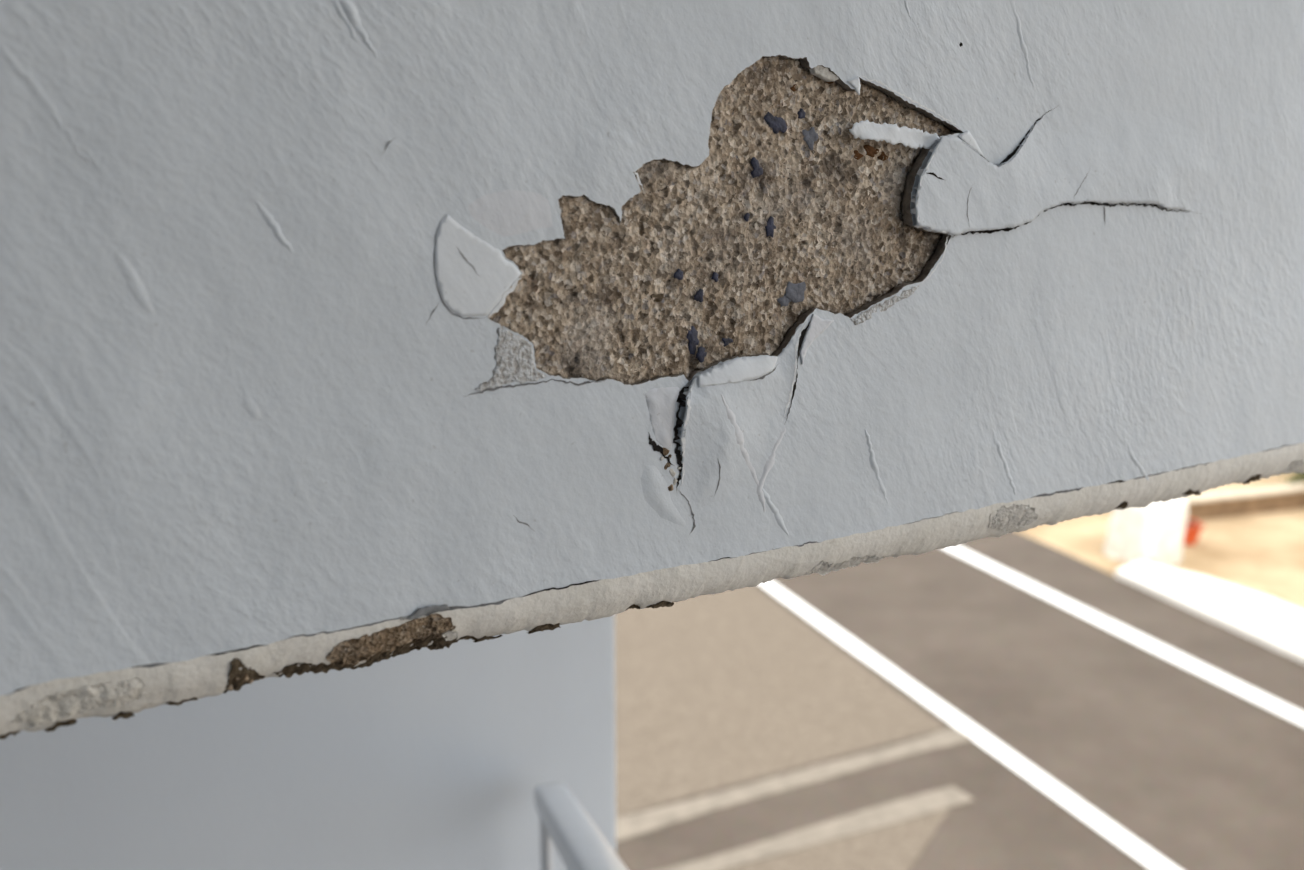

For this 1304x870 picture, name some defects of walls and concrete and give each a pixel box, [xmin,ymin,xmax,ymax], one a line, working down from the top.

crack [958,105,1059,167]
crack [954,173,1200,236]
spalling [427,55,964,513]
crack [648,386,696,535]
crack [1031,462,1212,498]
crack [709,541,821,562]
crack [131,661,171,669]
spalling [223,605,503,693]
crack [206,580,598,656]